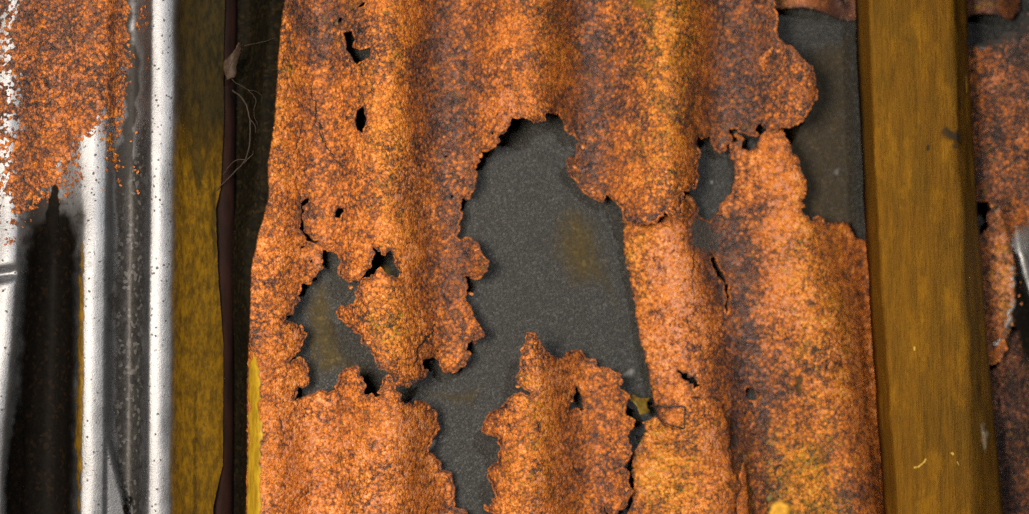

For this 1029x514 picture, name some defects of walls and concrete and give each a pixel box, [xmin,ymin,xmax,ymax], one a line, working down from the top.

rust [0,0,151,246]
rust [969,13,1029,514]